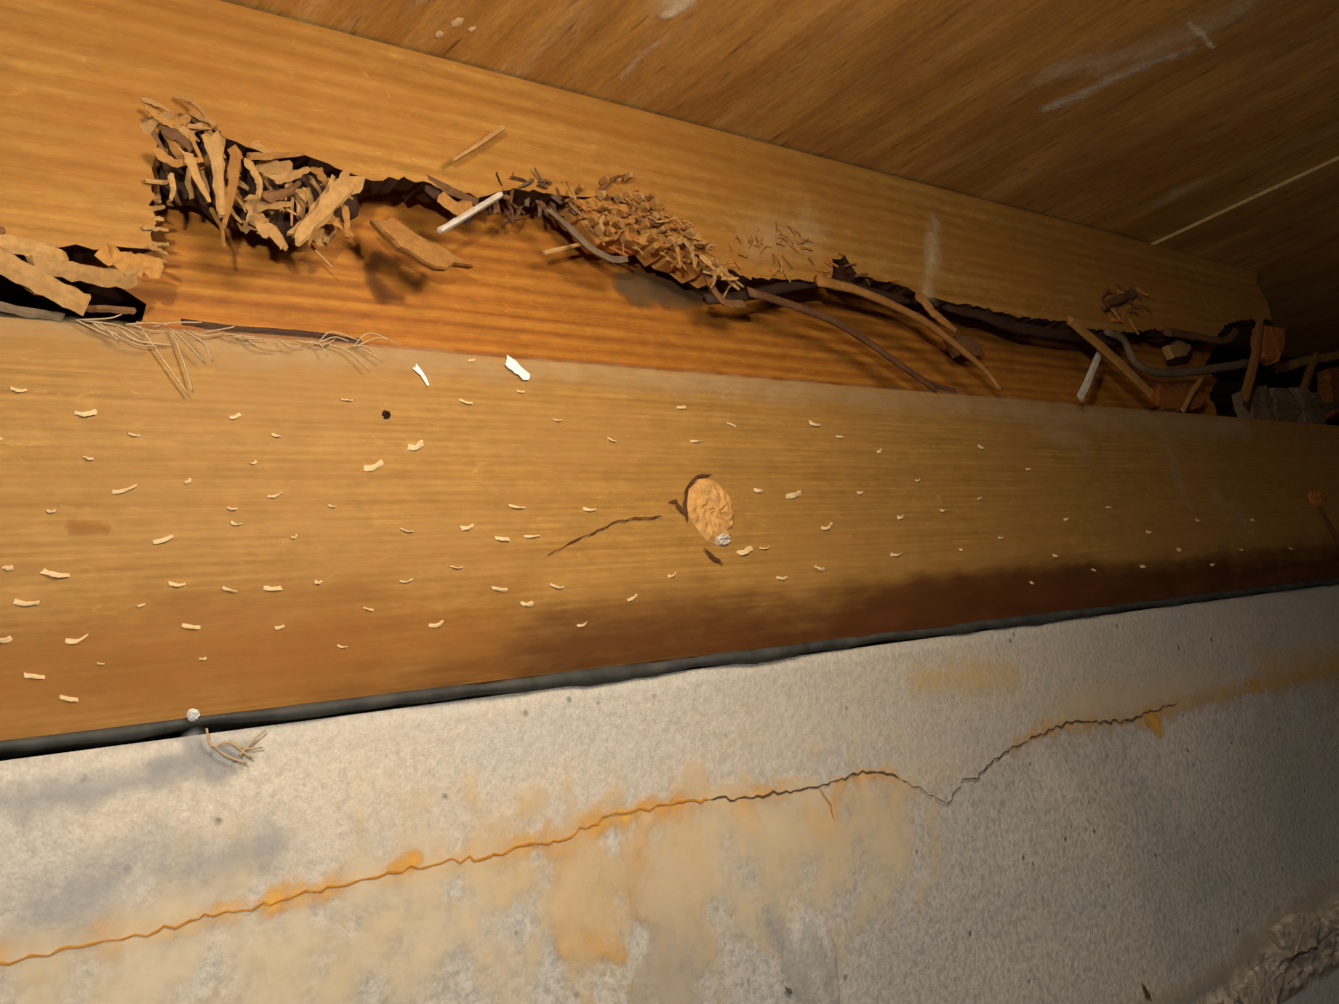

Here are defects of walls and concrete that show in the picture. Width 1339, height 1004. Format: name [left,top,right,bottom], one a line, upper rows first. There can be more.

peeling [369,217,473,271]
peeling [505,355,530,380]
water stain [0,547,1339,707]
corrosion [0,939,66,1004]
corrosion [94,898,238,1004]
corrosion [244,769,907,1004]
crack [0,703,1177,965]
spalling [1195,886,1339,1004]